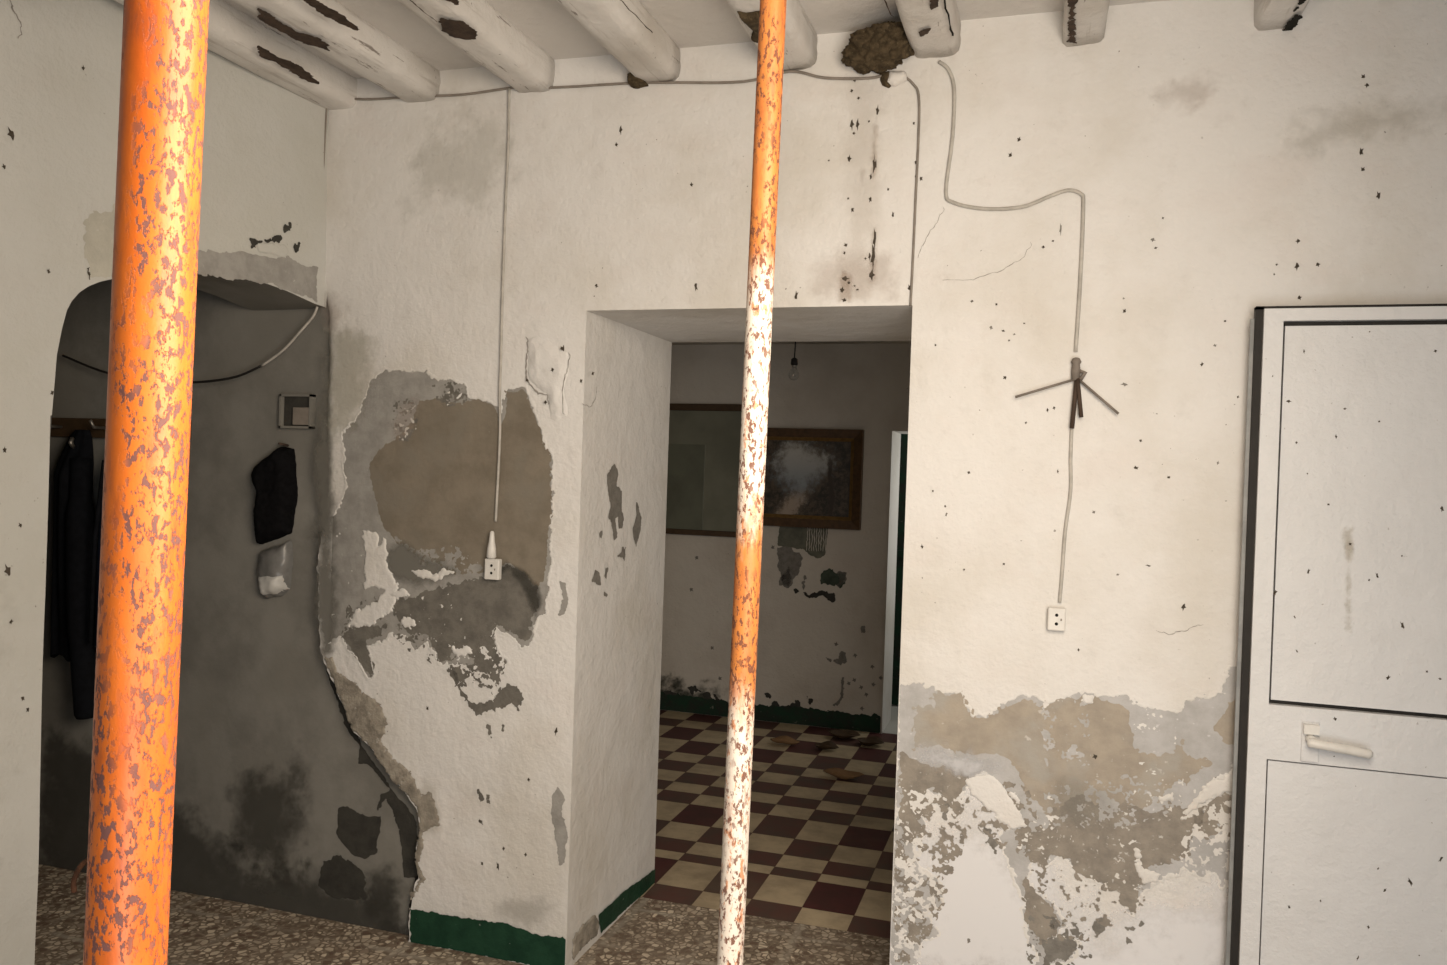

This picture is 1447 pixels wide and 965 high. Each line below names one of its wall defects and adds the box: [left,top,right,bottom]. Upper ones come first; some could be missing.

peeling [257,45,319,84]
peeling [438,0,478,40]
peeling [592,464,642,597]
peeling [771,526,847,603]
peeling [316,366,568,940]
peeling [826,642,882,711]
water stain [41,737,92,873]
water stain [170,777,399,933]
peeling [890,663,1237,965]